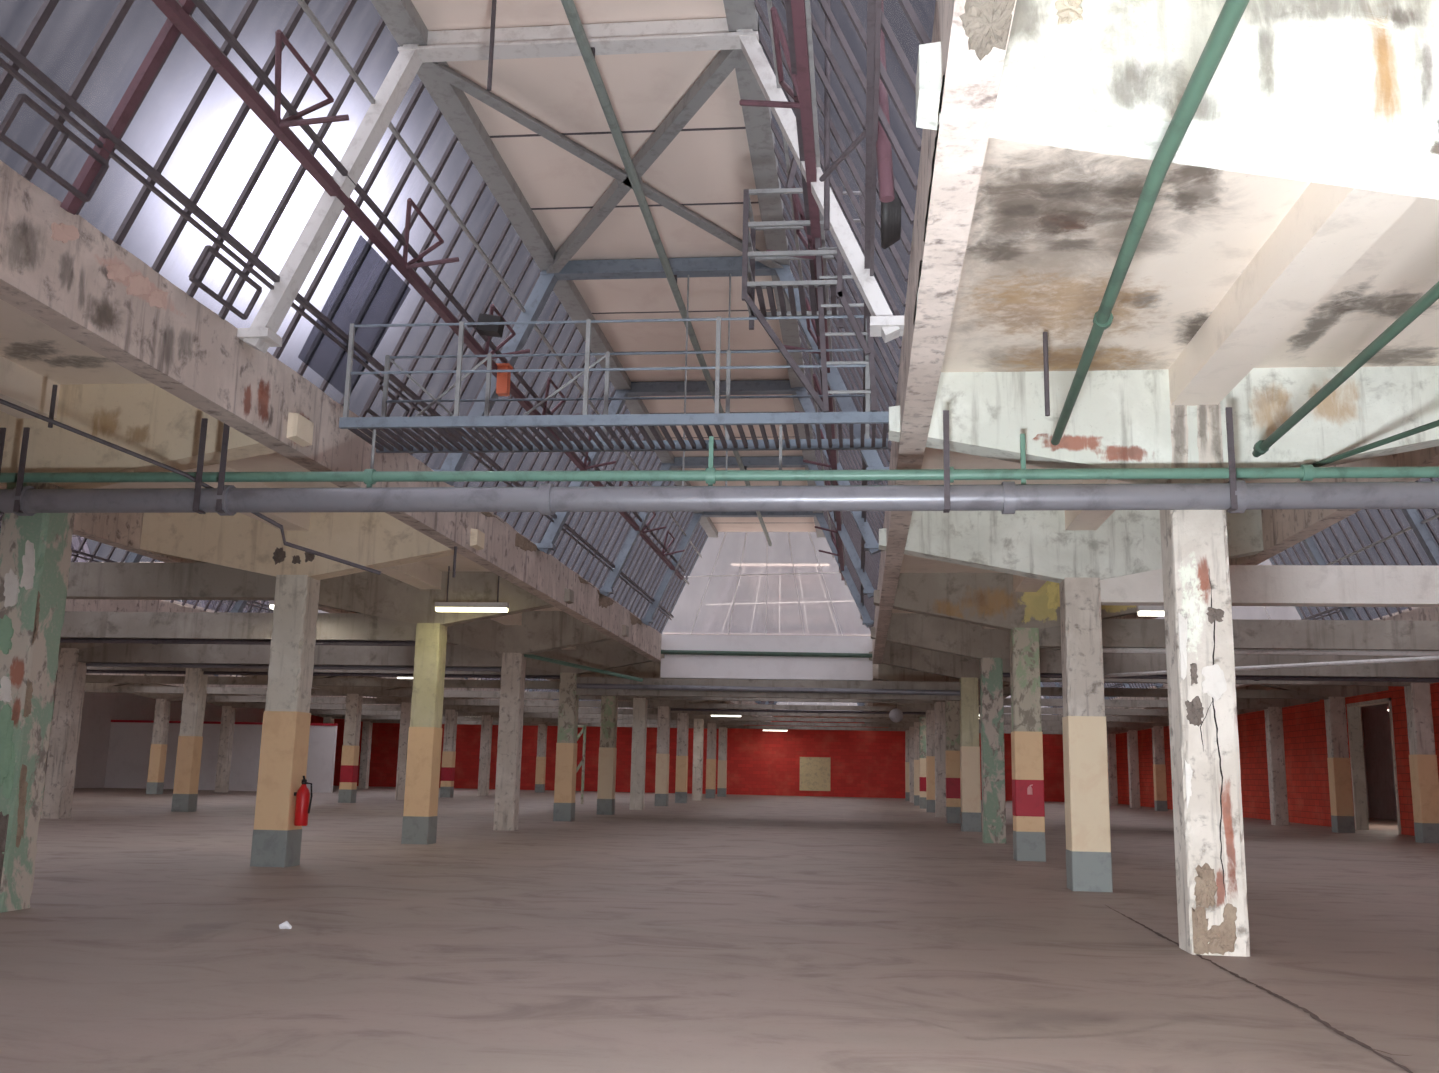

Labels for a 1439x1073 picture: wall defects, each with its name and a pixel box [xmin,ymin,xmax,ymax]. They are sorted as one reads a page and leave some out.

damp [1079,0,1226,121]
damp [1191,75,1234,128]
damp [1234,0,1439,146]
damp [942,138,1292,372]
damp [1241,263,1439,448]
damp [1170,400,1224,483]
peeling [0,540,40,655]
peeling [1176,538,1227,727]
peeling [0,676,33,886]
peeling [1185,760,1193,808]
spalling [1192,863,1237,955]
crack [1106,905,1413,1073]